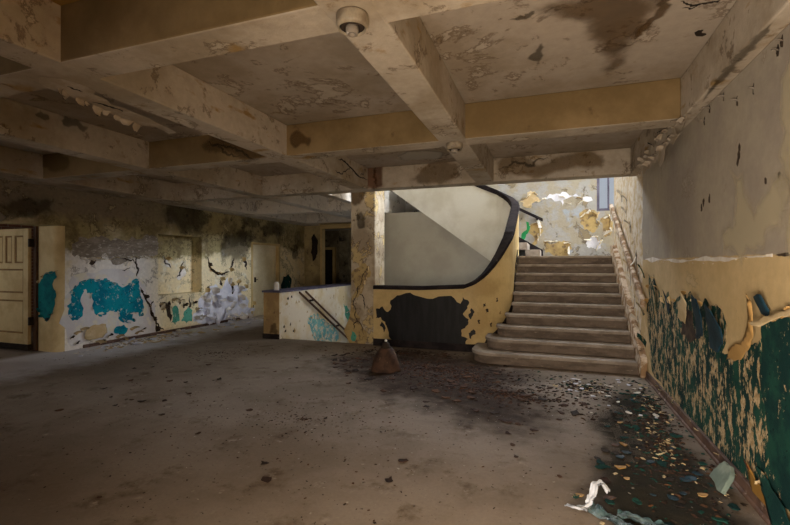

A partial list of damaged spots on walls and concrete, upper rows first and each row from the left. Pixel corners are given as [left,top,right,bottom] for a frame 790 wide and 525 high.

leakage [559,0,670,69]
crack [122,258,164,332]
flaking render [36,234,256,346]
peeling [622,241,790,525]